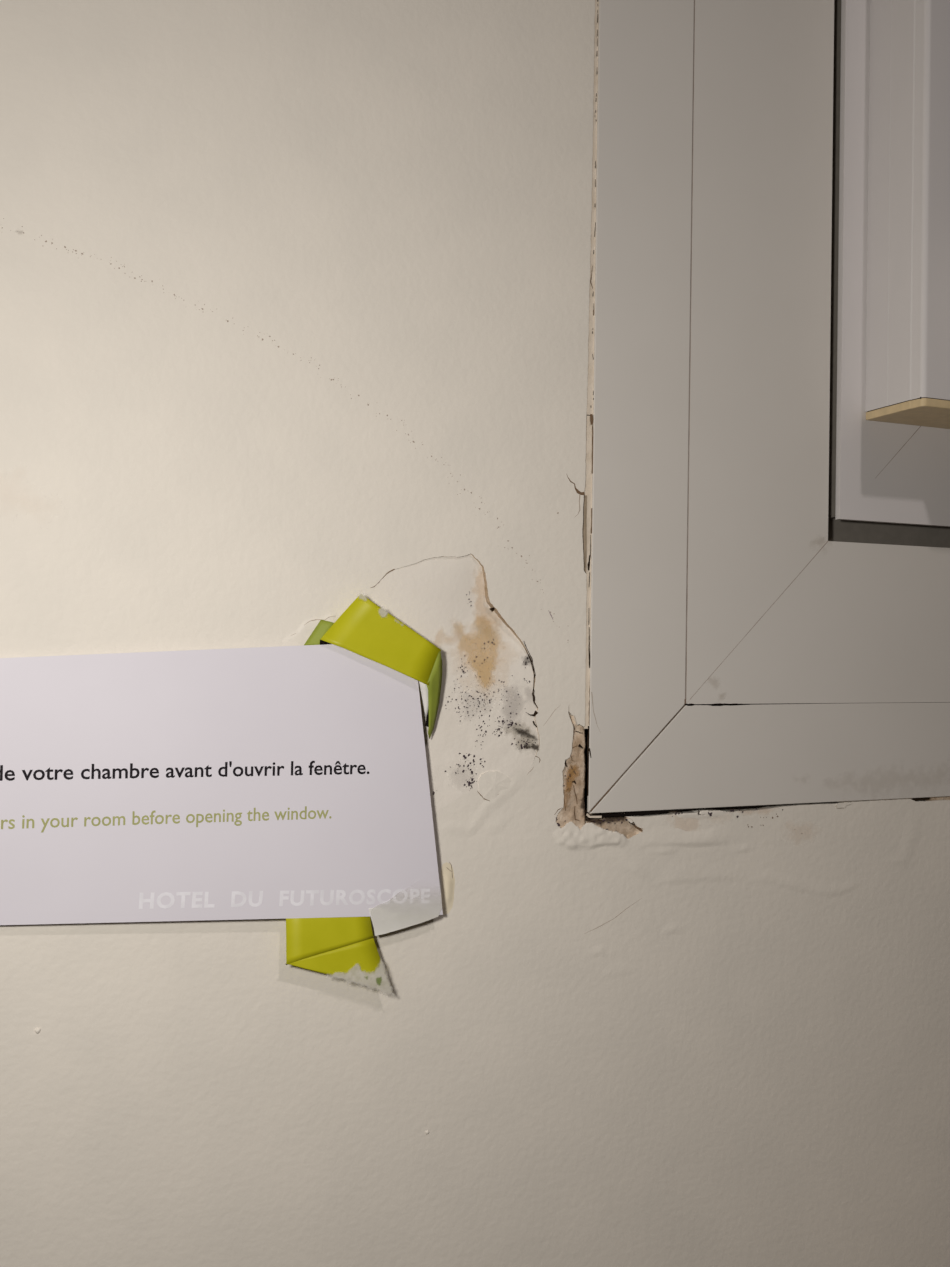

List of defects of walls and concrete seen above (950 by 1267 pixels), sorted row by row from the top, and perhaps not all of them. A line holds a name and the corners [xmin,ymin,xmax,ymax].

peeling [371,554,540,811]
water stain [445,639,538,789]
spalling [555,714,643,839]